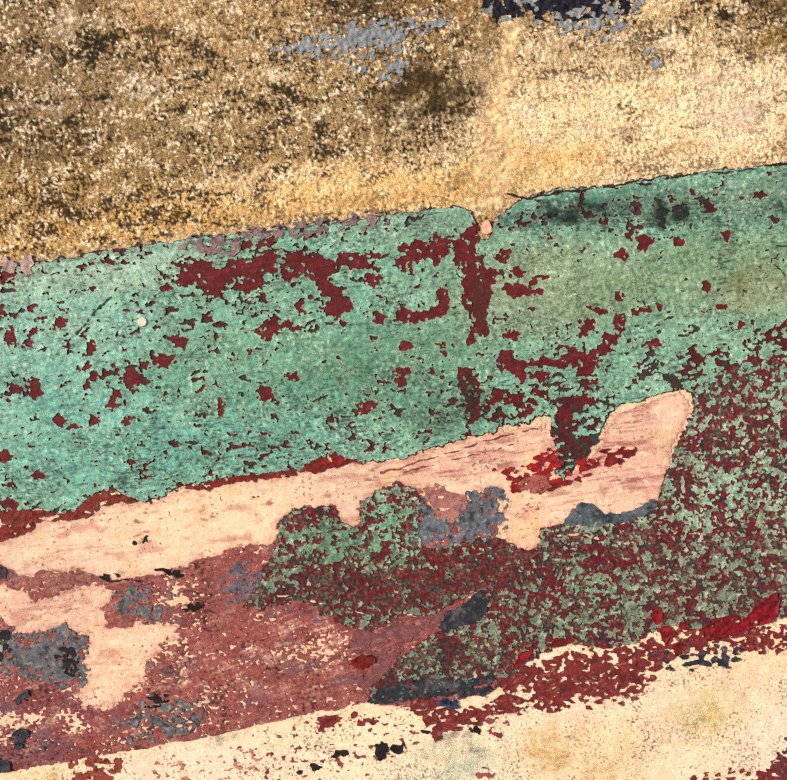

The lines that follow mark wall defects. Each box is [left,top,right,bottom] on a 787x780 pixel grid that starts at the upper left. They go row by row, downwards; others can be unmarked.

peeling [269,11,453,84]
peeling [481,0,646,46]
peeling [643,47,663,71]
peeling [0,255,42,284]
peeling [160,210,389,324]
peeling [372,223,550,347]
peeling [613,234,655,262]
flaking render [0,291,787,780]